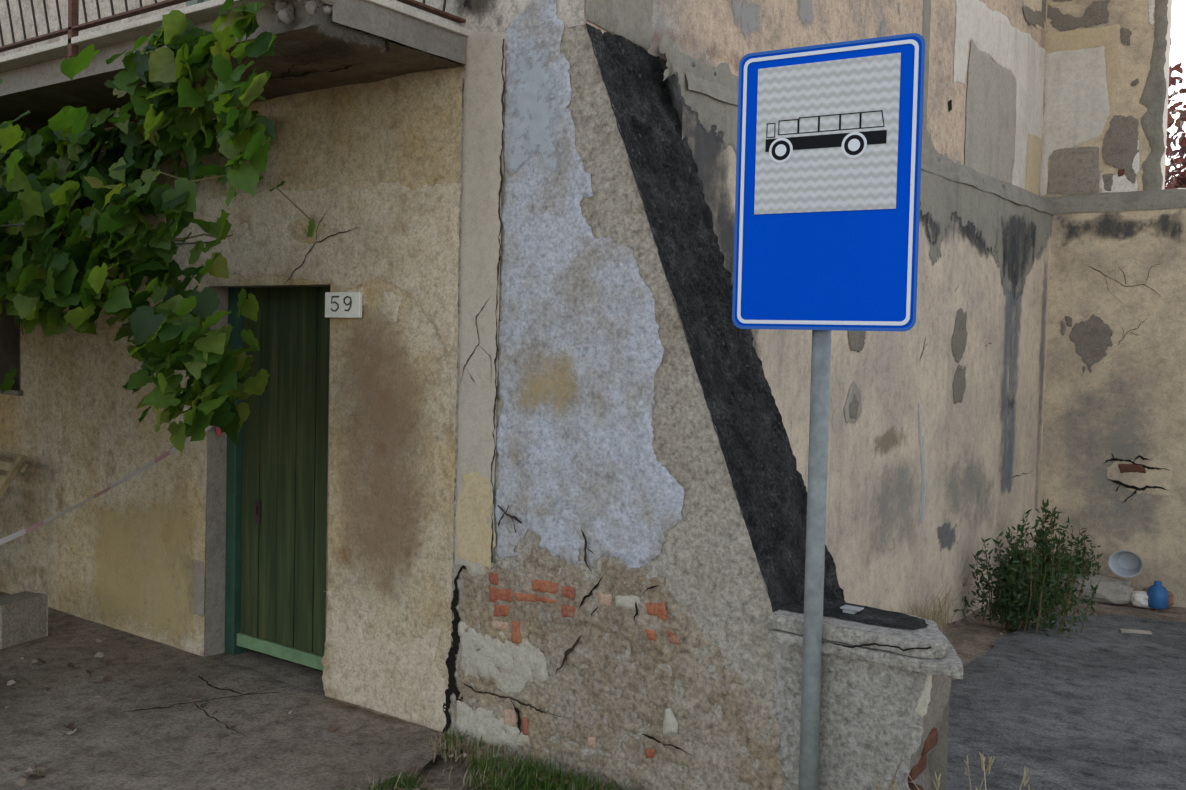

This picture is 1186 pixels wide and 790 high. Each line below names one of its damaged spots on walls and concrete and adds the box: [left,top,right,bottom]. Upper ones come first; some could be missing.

peeling [1099,115,1140,193]
water stain [1063,213,1181,239]
crack [442,39,571,734]
peeling [454,0,785,790]
water stain [919,201,1043,511]
water stain [1039,279,1047,430]
spalling [1061,314,1113,373]
water stain [877,429,898,452]
flaking render [1107,456,1172,497]
crack [556,530,603,674]
crack [634,586,657,620]
crack [642,734,691,755]